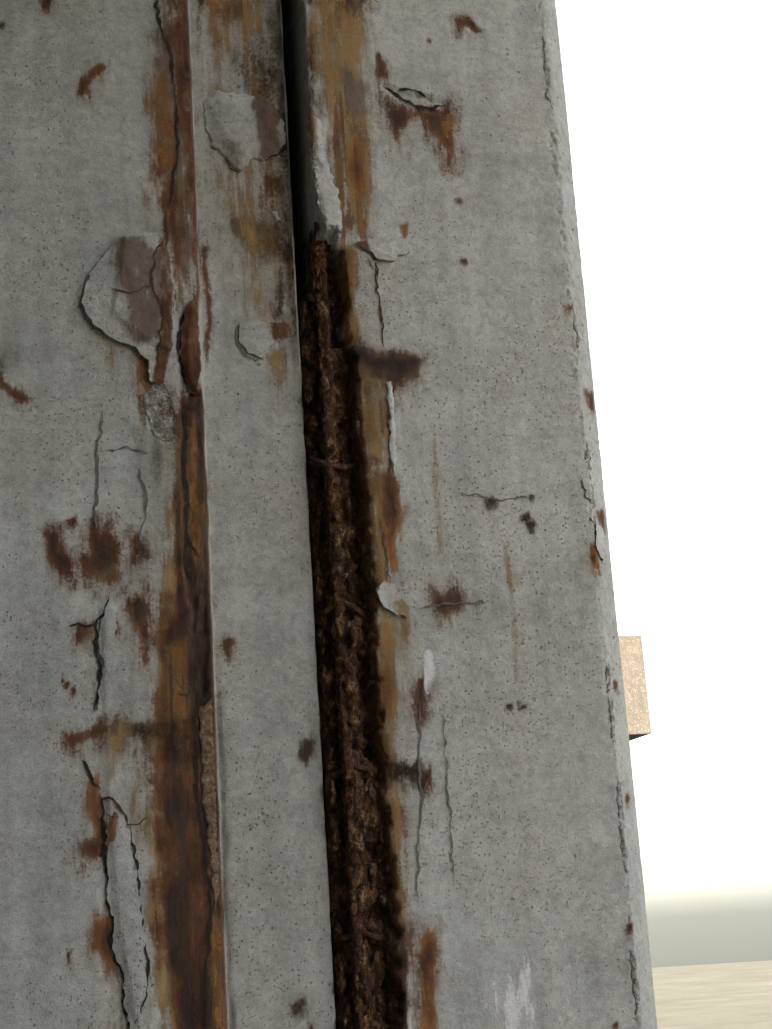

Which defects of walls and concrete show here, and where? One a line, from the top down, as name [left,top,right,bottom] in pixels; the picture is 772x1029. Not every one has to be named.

crack [93,411,148,539]
peeling [82,232,201,442]
corrosion [136,354,151,425]
crack [112,0,213,1029]
corrosion [143,0,283,360]
corrosion [230,144,294,323]
spalling [238,105,414,1029]
corrosion [307,0,467,1029]
crack [383,86,448,110]
corrosion [43,387,236,1029]
crack [82,760,150,1029]